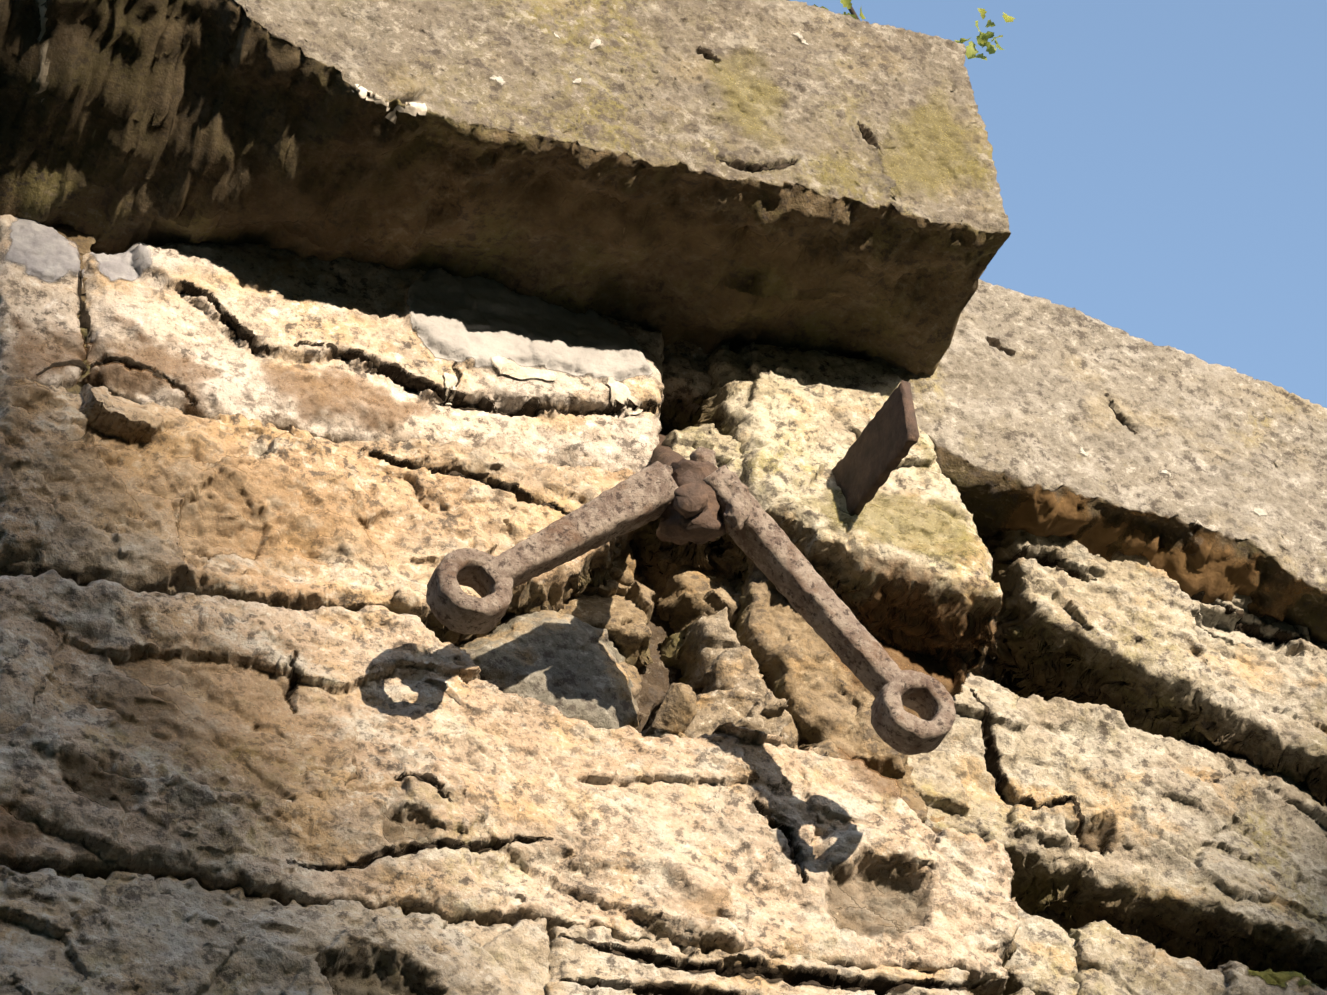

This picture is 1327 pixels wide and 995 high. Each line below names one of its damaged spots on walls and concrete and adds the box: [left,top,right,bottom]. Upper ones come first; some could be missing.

crack [36,261,196,406]
crack [179,279,660,418]
crack [284,656,300,714]
corrosion [851,563,984,697]
corrosion [840,749,901,795]
crack [967,689,1113,855]